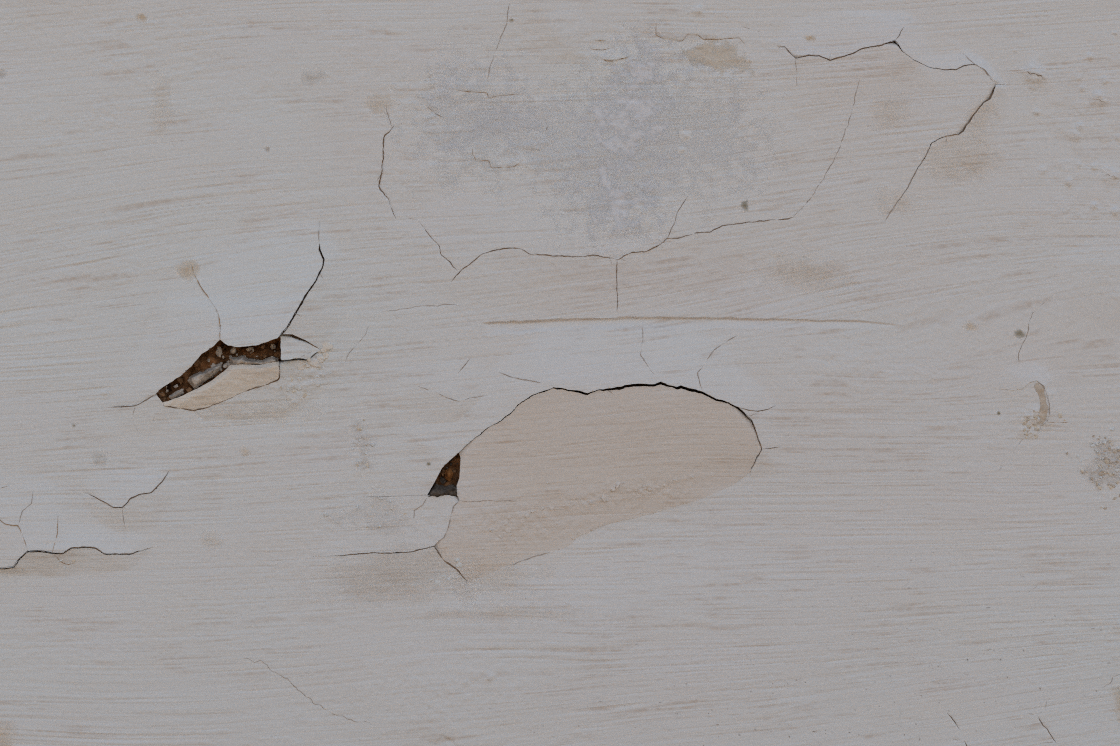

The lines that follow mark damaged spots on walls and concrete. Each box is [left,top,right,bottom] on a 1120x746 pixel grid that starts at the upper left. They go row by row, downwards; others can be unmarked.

crack [377,106,455,268]